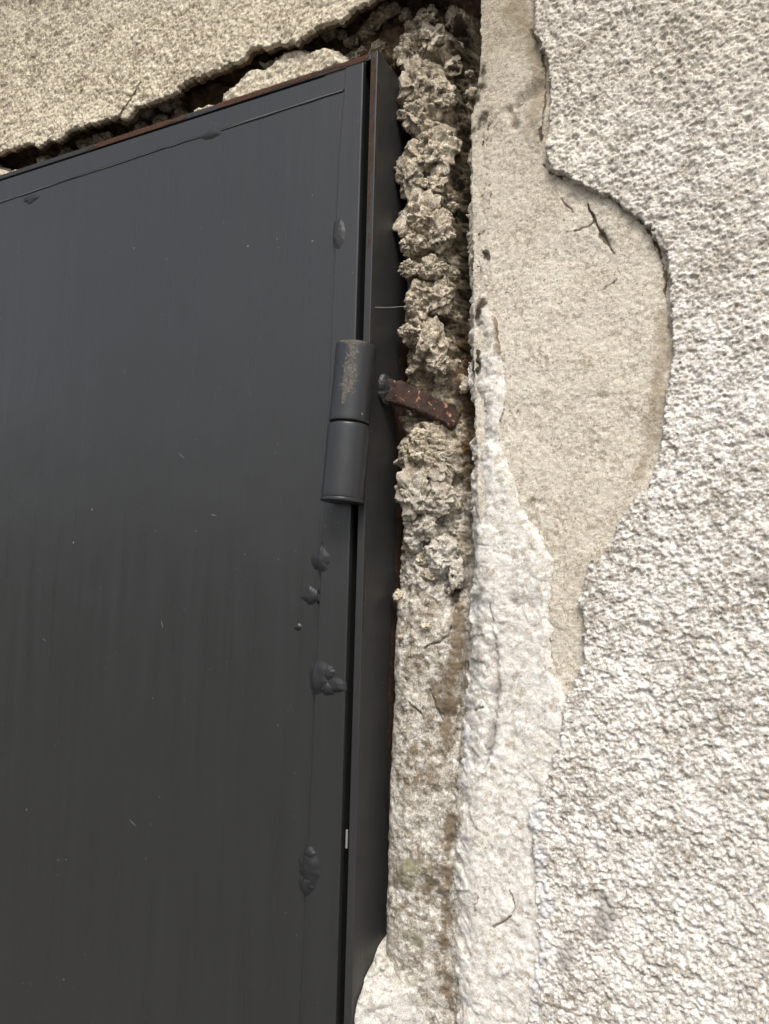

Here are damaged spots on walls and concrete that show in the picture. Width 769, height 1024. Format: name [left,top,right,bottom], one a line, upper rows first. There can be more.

crack [0,0,482,171]
crack [530,29,668,297]
peeling [386,0,674,1024]